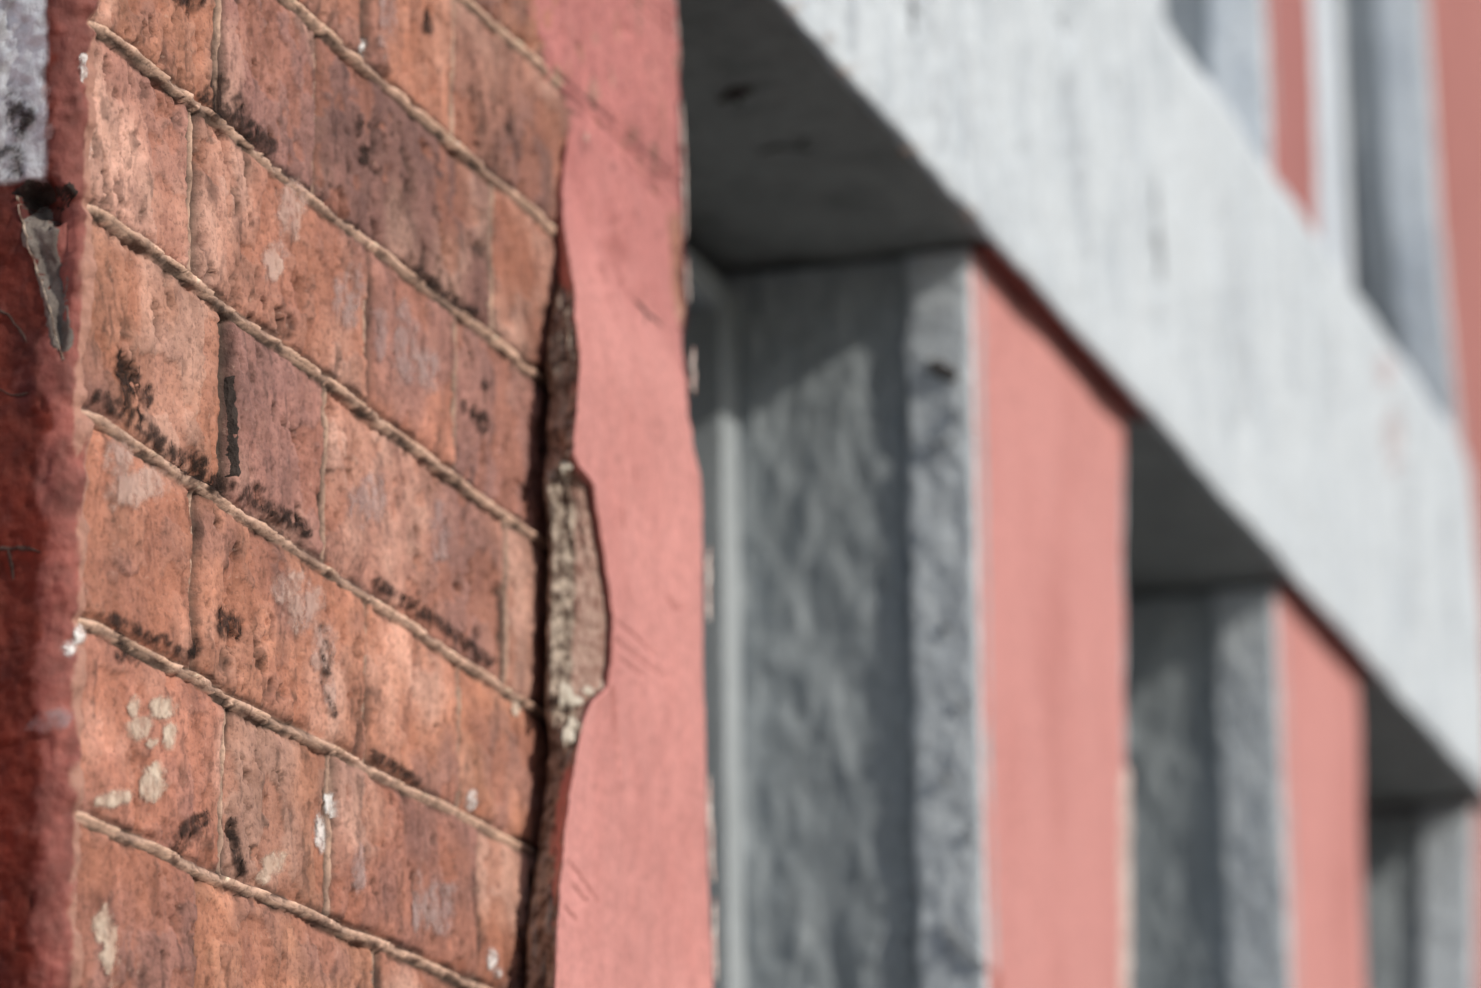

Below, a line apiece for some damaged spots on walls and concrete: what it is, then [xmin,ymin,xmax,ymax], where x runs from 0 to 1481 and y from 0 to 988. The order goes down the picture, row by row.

spalling [424,10,433,36]
spalling [356,115,369,165]
spalling [461,398,488,433]
spalling [526,238,606,988]
peeling [64,625,85,654]
peeling [322,642,338,718]
peeling [147,723,176,748]
peeling [95,791,131,807]
peeling [467,790,477,810]
damp [315,794,334,852]